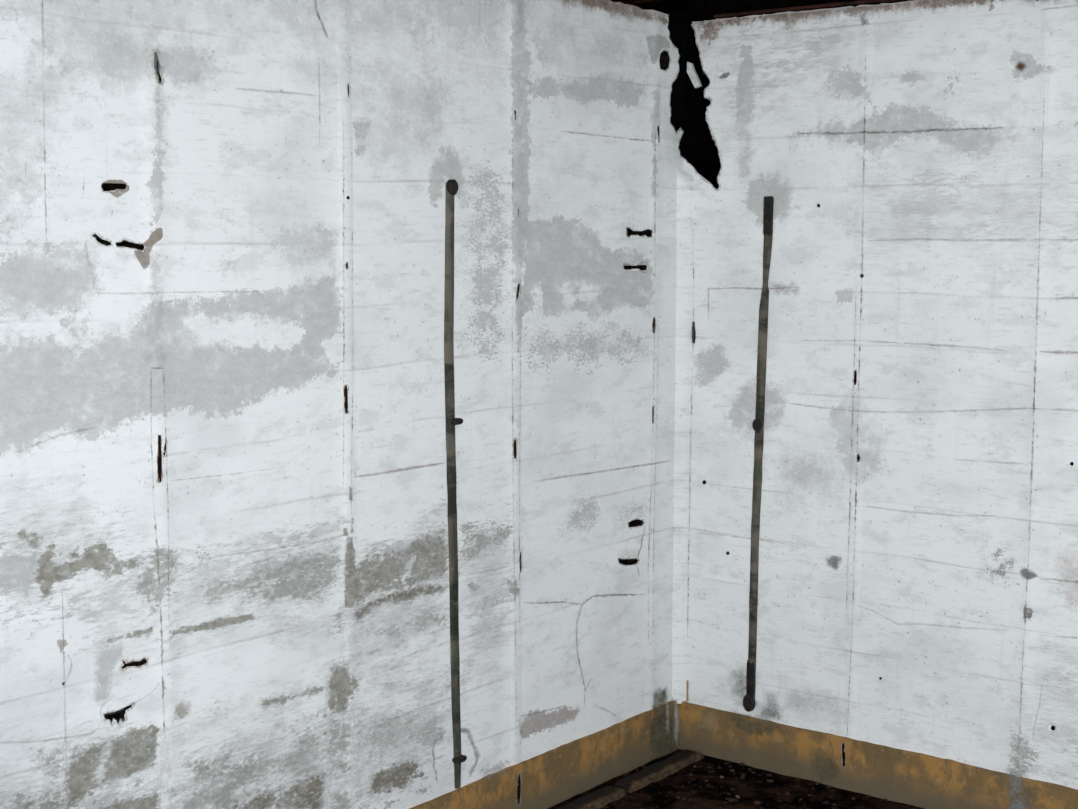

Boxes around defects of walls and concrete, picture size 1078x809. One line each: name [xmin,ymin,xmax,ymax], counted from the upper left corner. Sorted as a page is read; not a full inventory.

peeling [844,0,1002,13]
damp [148,150,165,195]
damp [510,0,659,329]
spalling [584,0,780,190]
damp [0,243,96,315]
damp [0,277,342,453]